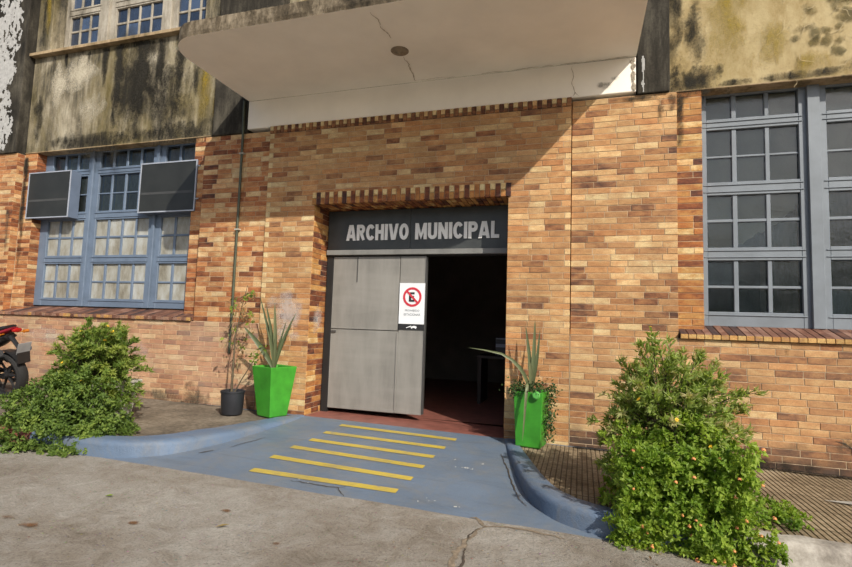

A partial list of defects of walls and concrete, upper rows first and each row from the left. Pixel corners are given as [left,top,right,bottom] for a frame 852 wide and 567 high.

water stain [669,0,704,55]
peeling [0,0,24,150]
water stain [34,99,43,139]
water stain [52,29,215,162]
water stain [659,65,722,144]
water stain [767,67,837,81]
crack [448,517,565,567]